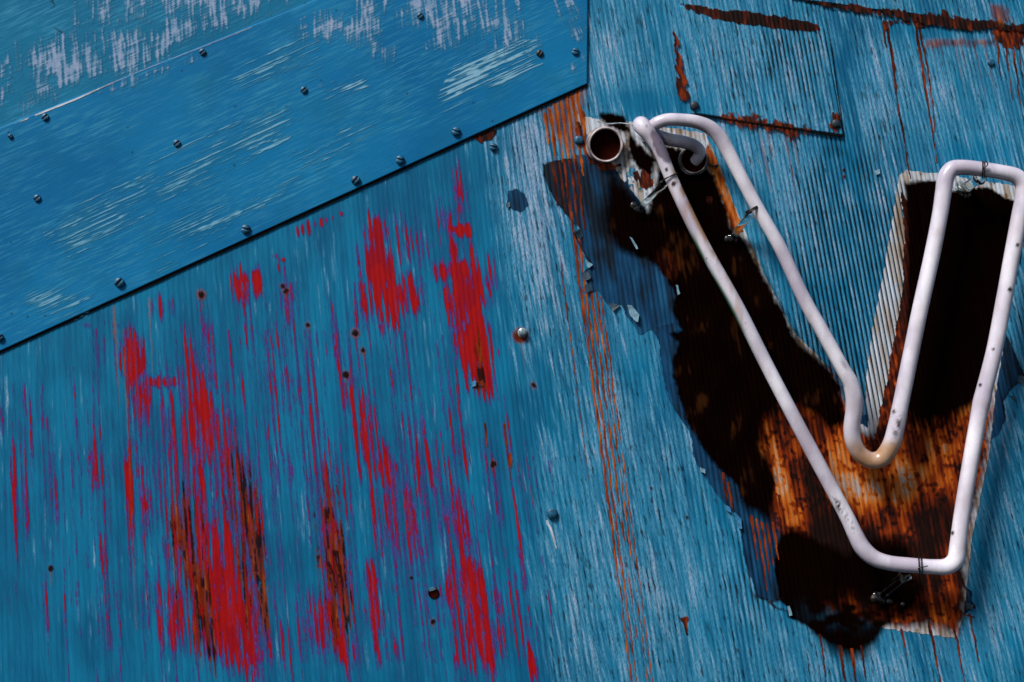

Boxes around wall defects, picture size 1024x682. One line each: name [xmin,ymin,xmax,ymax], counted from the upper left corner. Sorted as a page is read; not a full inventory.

peeling [74,0,119,27]
peeling [0,160,539,682]
corrosion [543,91,653,682]
peeling [543,114,792,616]
corrosion [680,4,820,32]
corrosion [749,407,856,589]
corrosion [796,396,972,559]
corrosion [860,192,909,452]
peeling [860,170,938,436]
corrosion [818,1,1024,179]
peeling [883,337,1024,639]
peeling [952,176,1015,201]